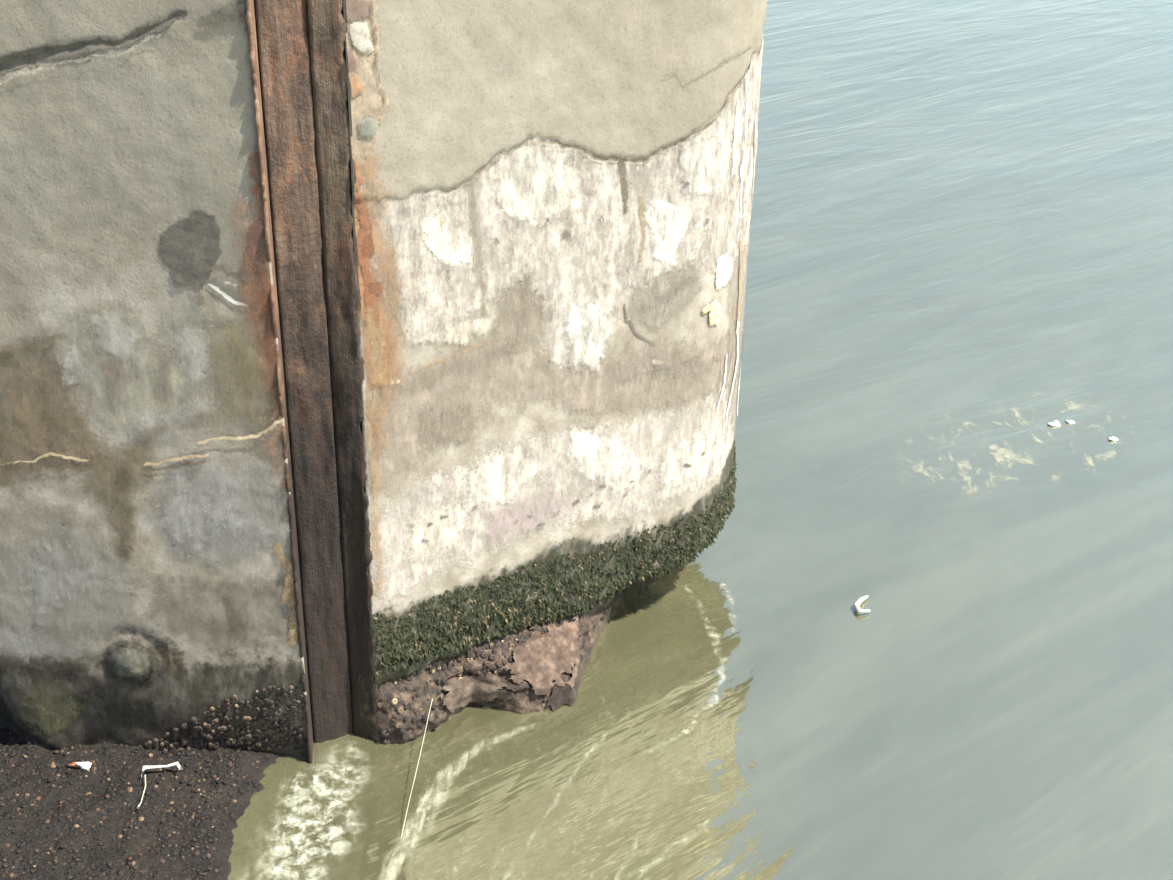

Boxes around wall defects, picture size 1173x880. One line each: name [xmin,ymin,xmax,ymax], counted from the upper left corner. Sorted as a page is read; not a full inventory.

crack [0,0,246,84]
leakage [159,210,251,306]
corrosion [235,156,282,456]
corrosion [354,157,402,444]
peeling [370,31,763,605]
crack [0,452,94,469]
crack [143,418,283,472]